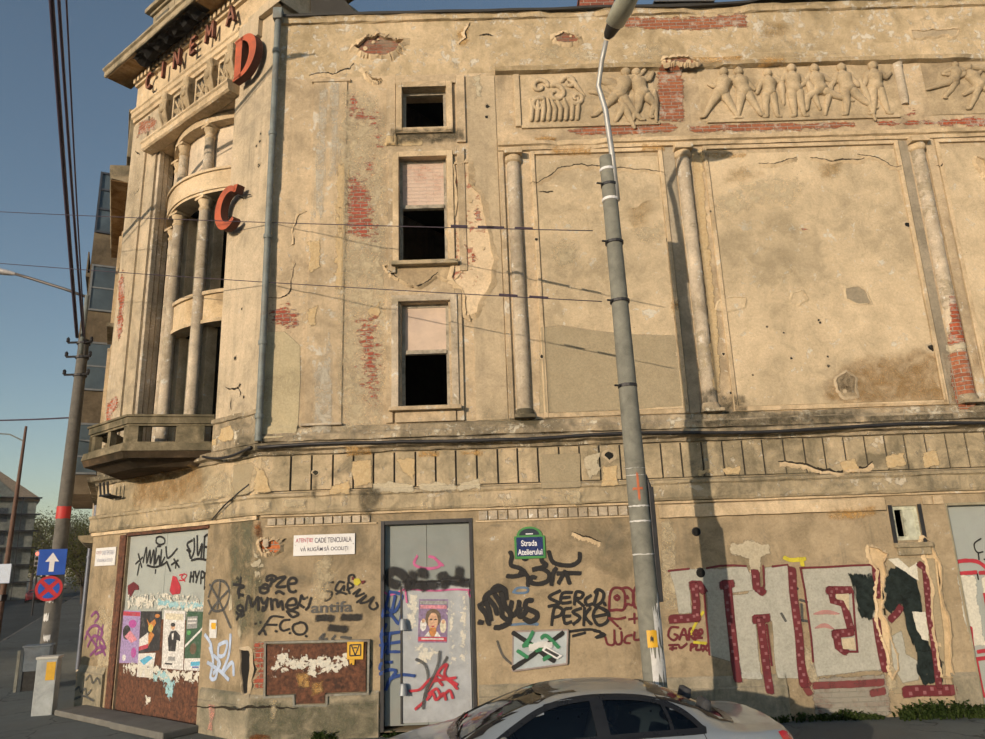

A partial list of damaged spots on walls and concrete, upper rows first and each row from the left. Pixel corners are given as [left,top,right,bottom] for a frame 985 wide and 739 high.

flaking render [625,12,748,31]
flaking render [349,30,410,62]
crack [310,62,379,86]
flaking render [567,54,855,136]
peeling [333,93,423,289]
crack [530,163,663,193]
crack [759,154,902,170]
flaking render [382,158,499,322]
flaking render [946,296,977,410]
leakage [830,364,943,401]
leakage [704,398,856,428]
crack [778,460,874,477]